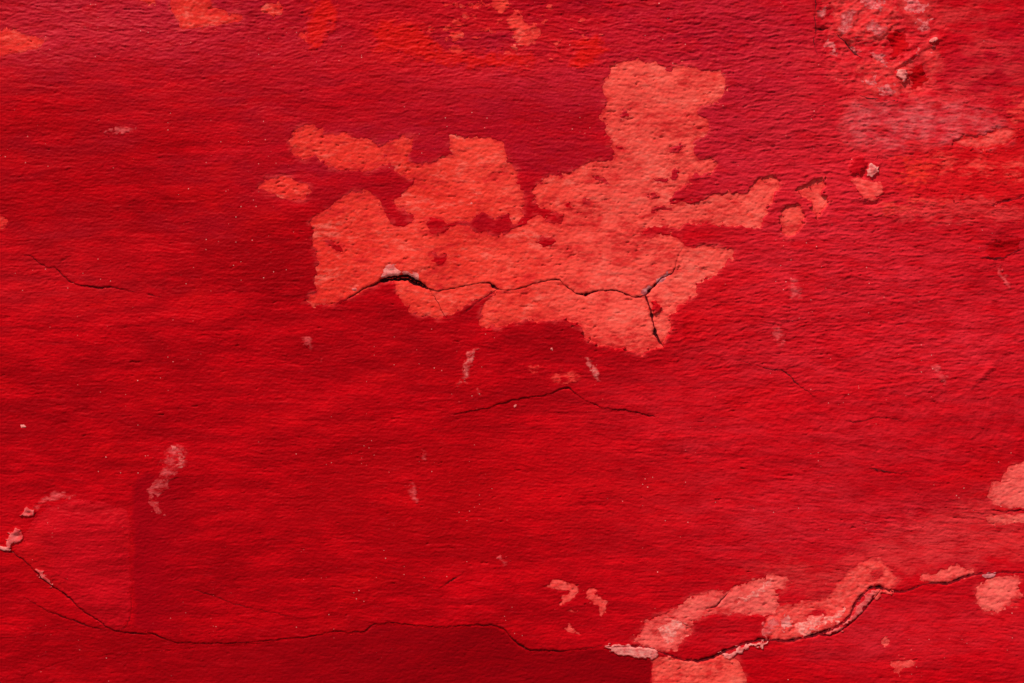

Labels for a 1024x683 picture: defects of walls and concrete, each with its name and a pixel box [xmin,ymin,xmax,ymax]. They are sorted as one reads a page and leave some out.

peeling [427,0,553,54]
peeling [289,58,828,356]
crack [337,249,682,346]
peeling [986,461,1024,527]
peeling [23,557,899,683]
crack [0,549,1024,663]
peeling [890,658,916,677]
peeling [920,563,1024,615]